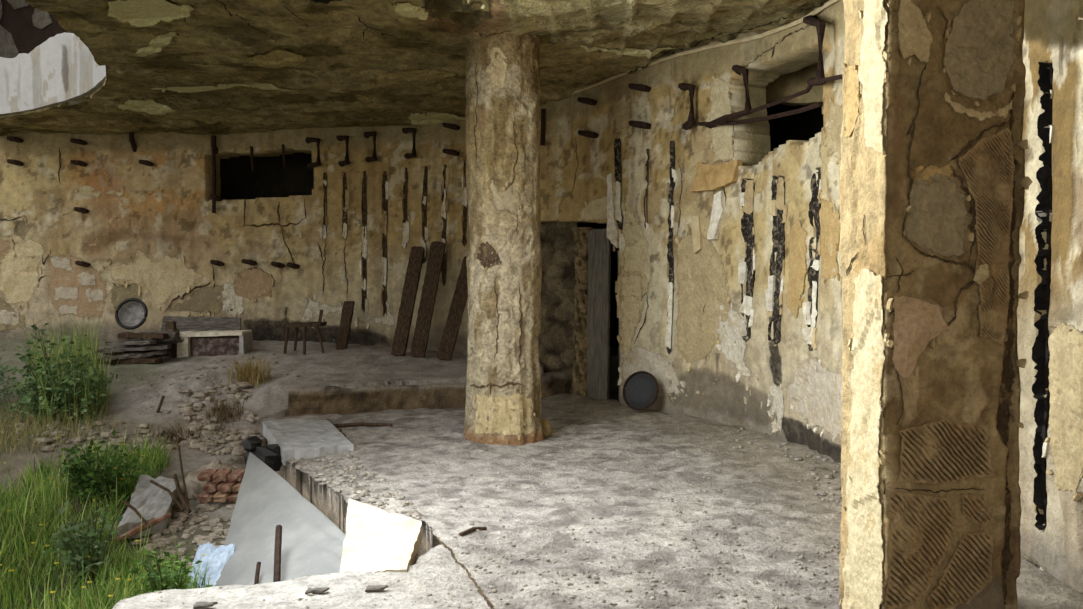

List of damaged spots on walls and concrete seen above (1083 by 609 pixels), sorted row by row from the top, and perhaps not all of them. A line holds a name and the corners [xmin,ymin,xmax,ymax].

spalling [0,215,274,332]
flaking render [824,0,1047,604]
crack [887,63,1010,326]
flaking render [1034,211,1052,270]
flaking render [1042,322,1083,501]
crack [426,529,493,609]